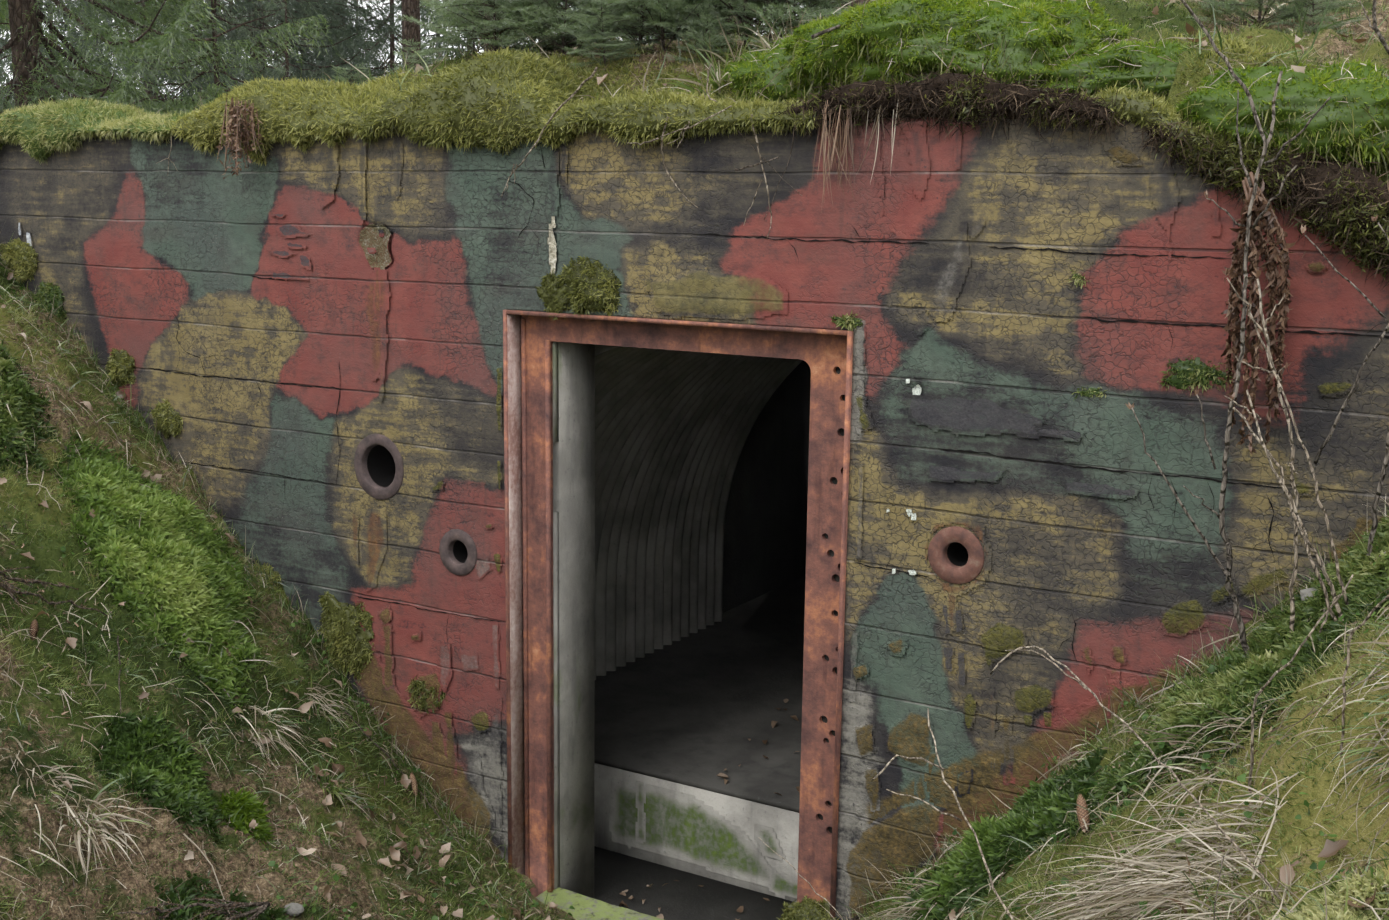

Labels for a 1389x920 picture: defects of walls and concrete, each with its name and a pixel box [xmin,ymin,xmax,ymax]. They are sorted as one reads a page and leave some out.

peeling [437,623,503,849]
leakage [853,721,881,812]